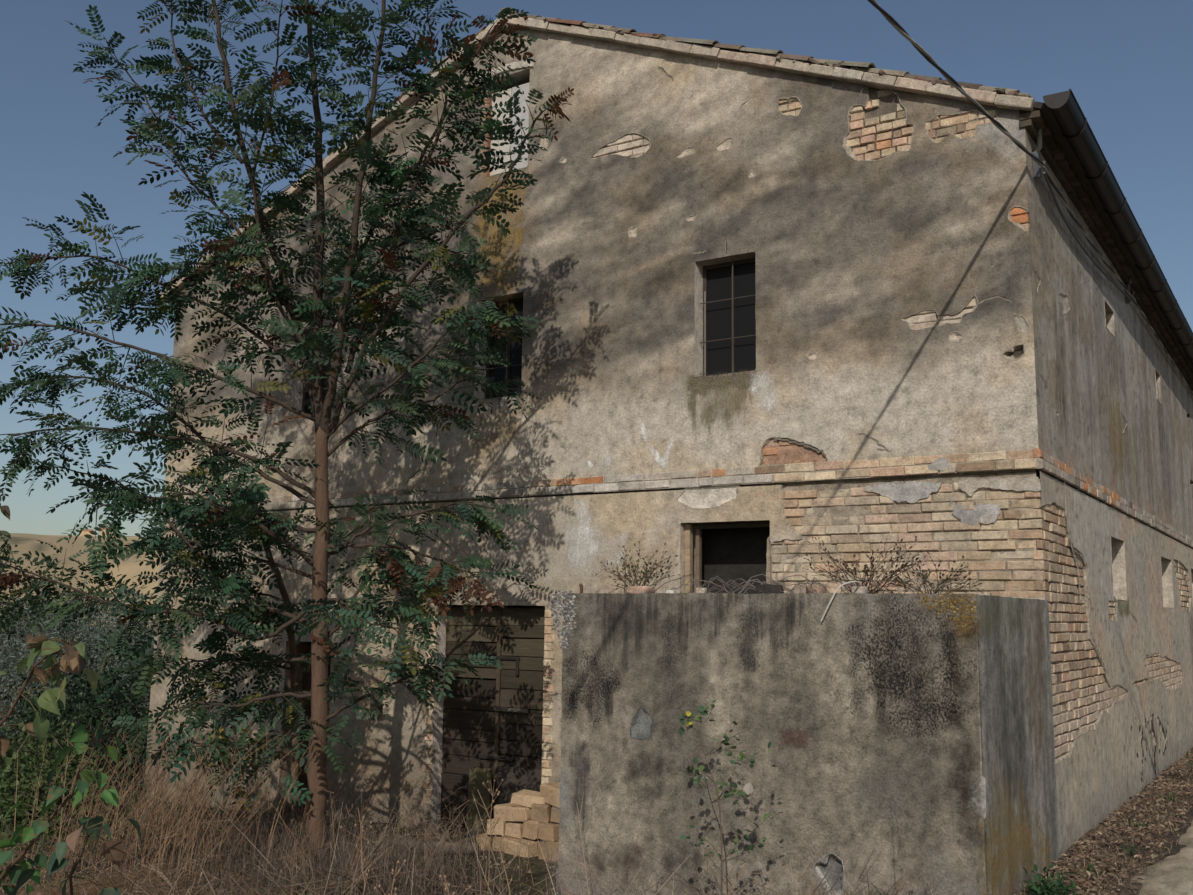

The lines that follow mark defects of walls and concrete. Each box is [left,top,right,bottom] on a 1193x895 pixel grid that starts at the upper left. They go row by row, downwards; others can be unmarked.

spalling [590,132,651,160]
spalling [777,96,802,116]
spalling [842,86,998,161]
spalling [1008,206,1030,233]
spalling [901,295,978,343]
spalling [759,437,828,467]
peeling [676,485,740,510]
spalling [1173,558,1192,614]
spalling [755,457,1183,765]
leakage [562,651,620,727]
leakage [845,595,977,736]
spalling [813,852,845,895]